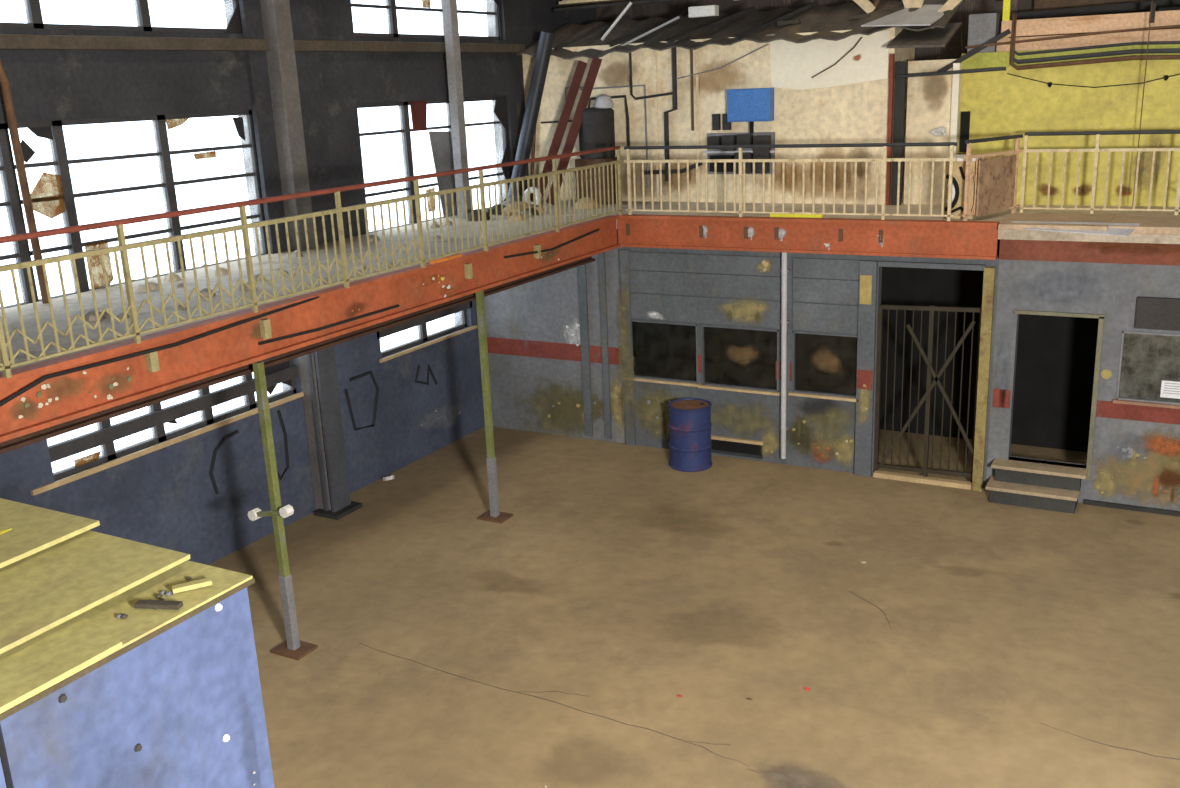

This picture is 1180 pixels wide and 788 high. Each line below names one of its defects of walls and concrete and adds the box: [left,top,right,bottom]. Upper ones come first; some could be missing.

crack [359,642,820,788]
crack [1041,723,1180,760]